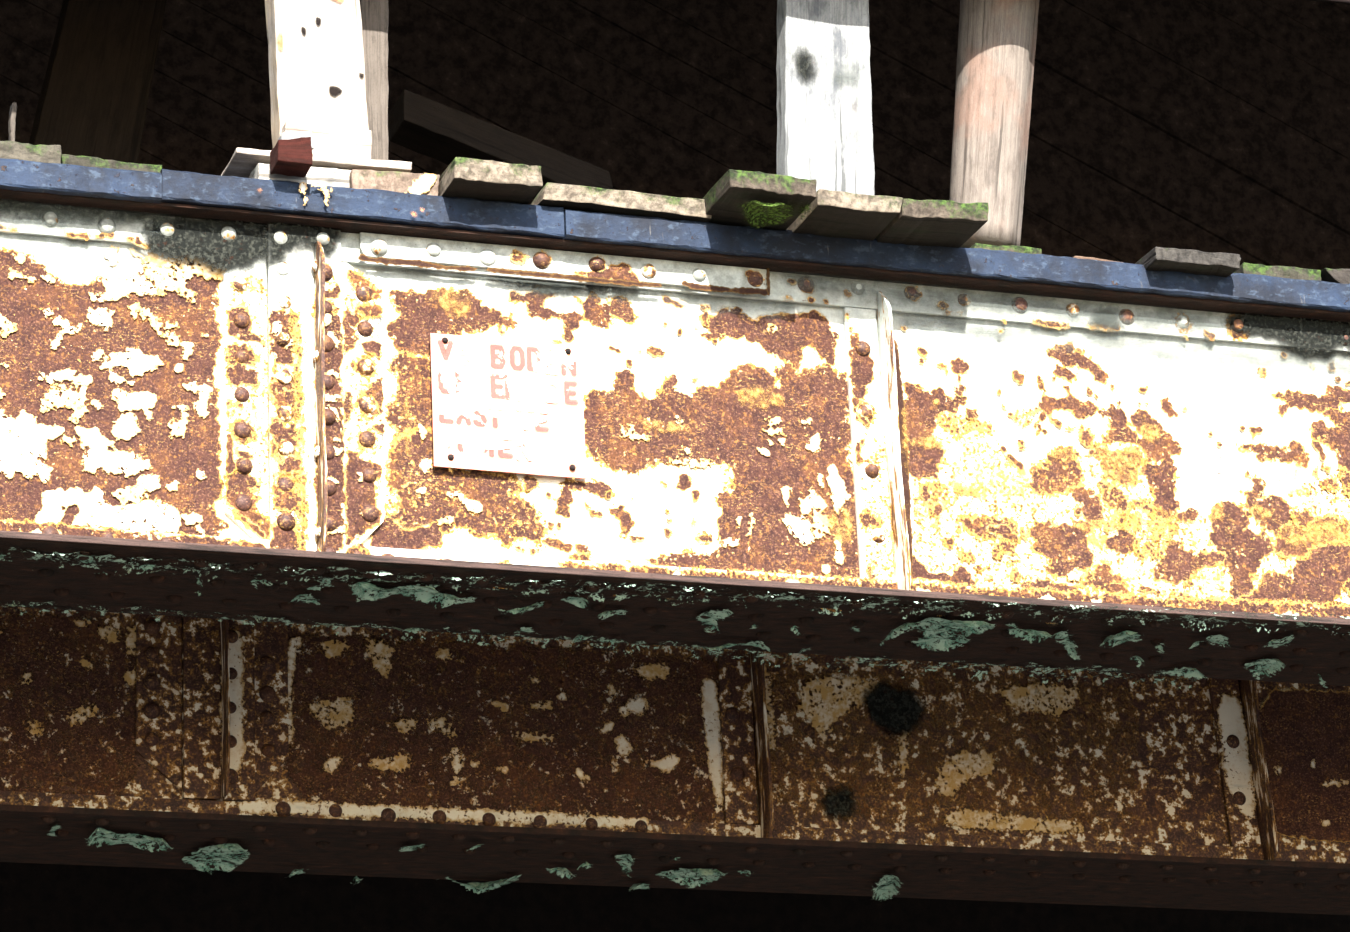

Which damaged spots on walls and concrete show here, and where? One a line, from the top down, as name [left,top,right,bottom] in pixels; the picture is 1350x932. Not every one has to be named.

rust [66,232,148,249]
rust [214,249,1350,619]
peeling [84,828,250,872]
peeling [437,875,521,894]
peeling [546,862,594,879]
peeling [614,854,751,891]